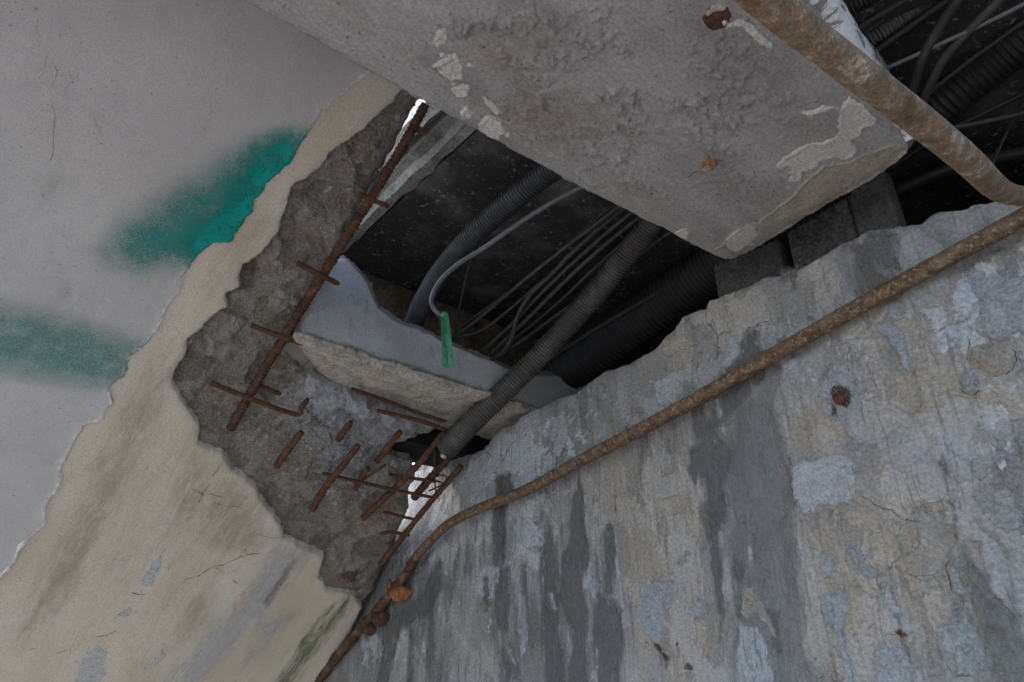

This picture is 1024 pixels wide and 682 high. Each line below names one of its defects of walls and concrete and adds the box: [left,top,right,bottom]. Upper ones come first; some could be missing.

peeling [433,27,511,140]
peeling [700,95,909,259]
spalling [210,102,492,567]
rust [816,374,865,426]
peeling [792,442,861,515]
peeling [74,645,109,682]
crack [182,534,280,584]
rust [314,556,419,682]
water stain [483,473,528,682]
water stain [541,480,625,682]